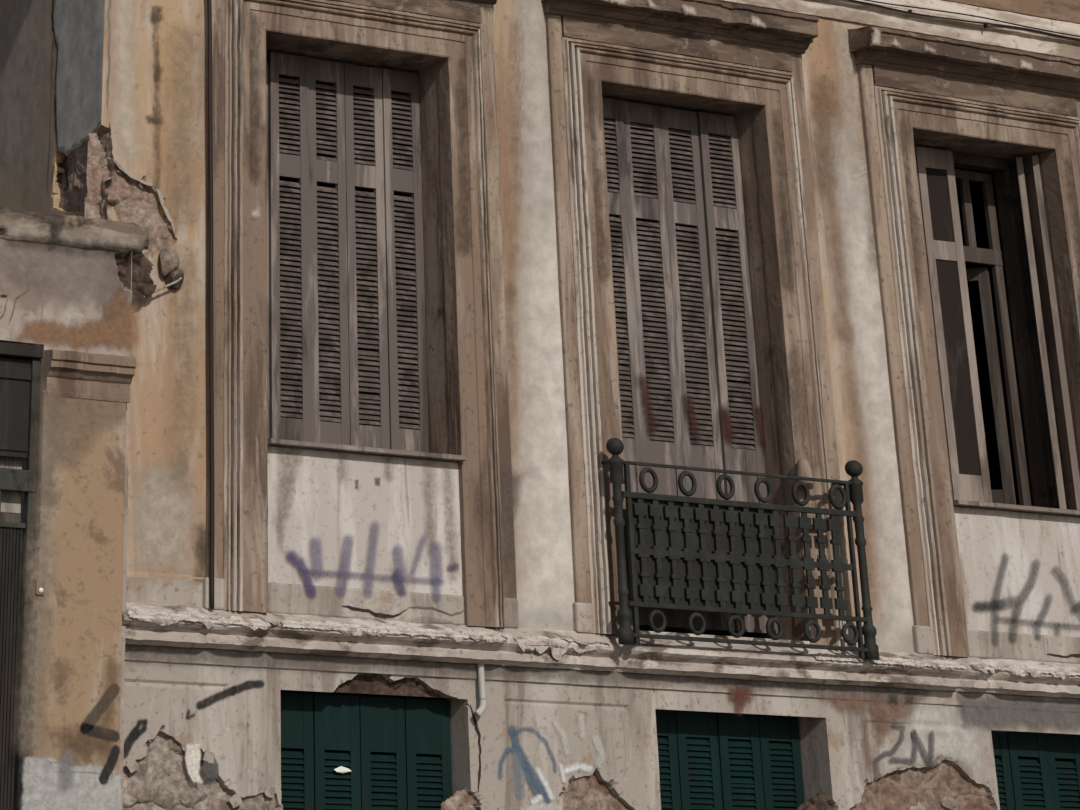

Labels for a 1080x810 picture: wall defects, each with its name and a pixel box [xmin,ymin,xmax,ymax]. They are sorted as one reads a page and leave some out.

crack [46,0,68,197]
spalling [8,126,184,303]
crack [0,281,43,323]
water stain [22,395,123,753]
spalling [334,672,445,698]
spalling [123,732,283,810]
spalling [441,787,505,810]
spalling [559,773,630,810]
spalling [849,760,993,810]